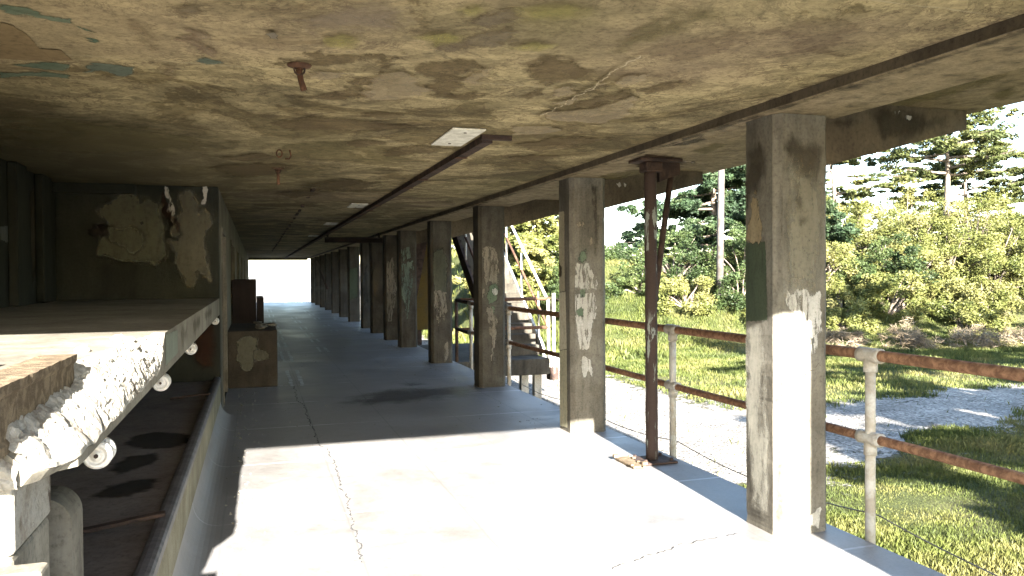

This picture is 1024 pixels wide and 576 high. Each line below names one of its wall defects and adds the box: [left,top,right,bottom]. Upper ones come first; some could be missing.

water stain [275,36,401,101]
water stain [273,112,452,157]
water stain [415,8,594,101]
crack [542,56,641,115]
water stain [574,82,682,109]
water stain [745,145,764,209]
peeling [93,188,213,288]
peeling [482,246,499,361]
peeling [575,237,598,377]
peeling [786,158,825,365]
spalling [6,330,178,472]
crack [283,387,363,562]